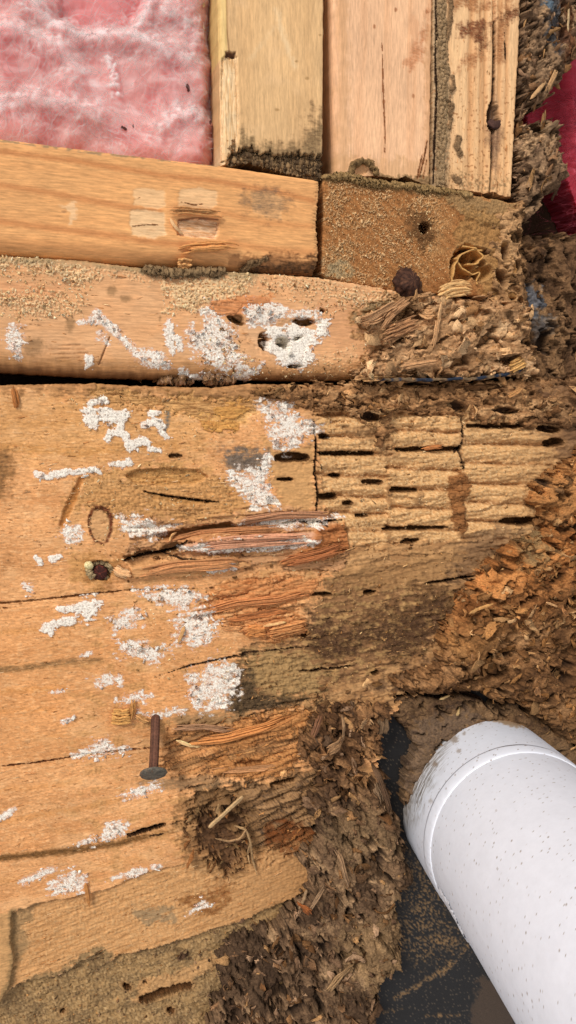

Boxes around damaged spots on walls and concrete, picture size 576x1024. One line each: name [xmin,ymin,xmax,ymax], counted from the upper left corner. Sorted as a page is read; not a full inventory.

peeling [93,289,576,449]
water stain [226,448,262,470]
peeling [127,468,205,485]
peeling [447,470,473,534]
peeling [231,512,346,531]
crack [123,540,199,561]
rust [84,560,115,583]
water stain [228,654,328,715]
peeling [135,706,187,718]
crack [127,823,164,838]
water stain [0,835,145,860]
peeling [191,678,406,1024]